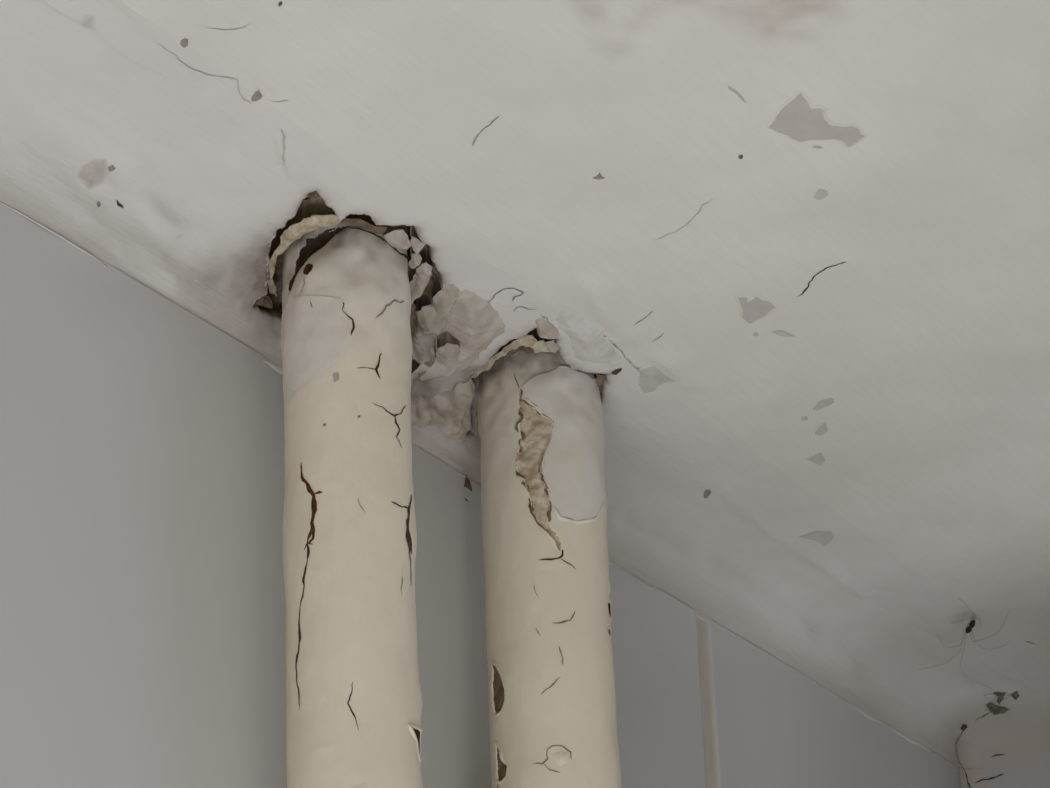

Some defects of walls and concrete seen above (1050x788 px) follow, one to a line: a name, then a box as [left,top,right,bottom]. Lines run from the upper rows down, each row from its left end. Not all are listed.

peeling [765,91,868,149]
crack [800,262,845,296]
crack [342,300,405,335]
spalling [253,197,624,443]
peeling [735,295,778,337]
crack [360,353,382,379]
crack [375,404,406,447]
crack [391,495,412,591]
crack [541,547,576,569]
crack [295,464,322,710]
crack [347,682,359,730]
crack [955,712,1003,788]